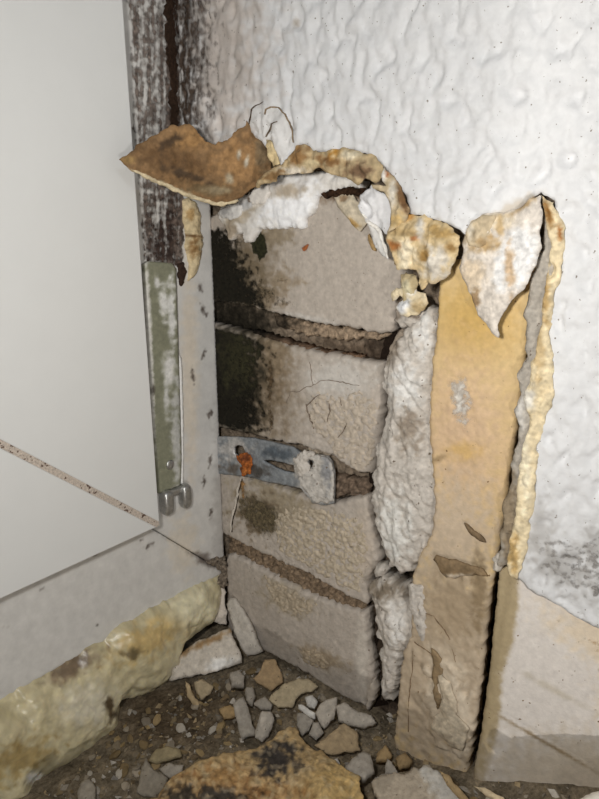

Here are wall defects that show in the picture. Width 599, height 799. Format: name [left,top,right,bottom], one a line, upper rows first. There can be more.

damp [129,0,214,143]
damp [139,174,184,266]
flaking render [218,171,370,243]
damp [211,227,287,309]
damp [215,329,274,432]
spalling [451,381,472,424]
spalling [497,215,554,566]
corrosion [236,452,253,498]
flaking render [274,296,439,710]